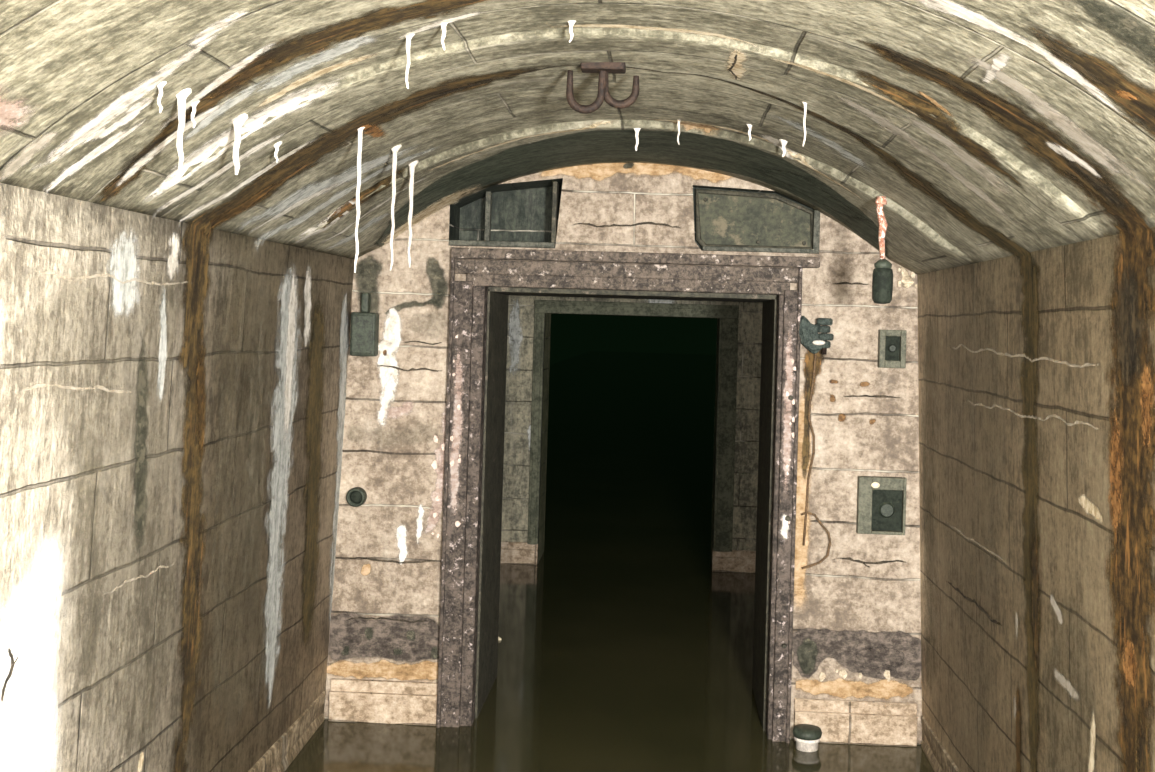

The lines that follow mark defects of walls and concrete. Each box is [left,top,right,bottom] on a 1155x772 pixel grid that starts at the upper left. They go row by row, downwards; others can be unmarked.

efflorescence [0,12,247,192]
efflorescence [110,233,137,313]
efflorescence [168,234,179,279]
efflorescence [180,143,308,221]
efflorescence [119,38,375,209]
water stain [246,148,433,248]
water stain [430,121,611,170]
water stain [265,187,477,700]
corrosion [794,349,846,605]
corrosion [842,28,1155,772]
water stain [0,546,61,772]
spalling [792,628,921,682]